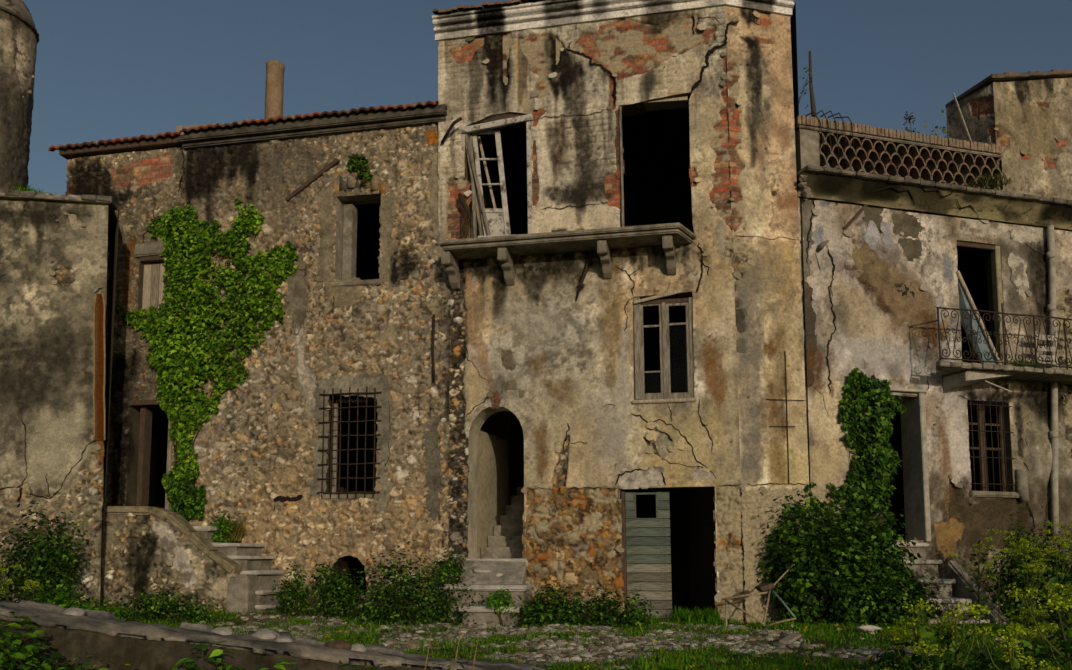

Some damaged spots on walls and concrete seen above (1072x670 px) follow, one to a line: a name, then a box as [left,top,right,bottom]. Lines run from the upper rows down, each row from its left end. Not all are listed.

water stain [0,10,32,188]
water stain [443,6,510,113]
water stain [545,0,580,18]
crack [538,41,617,119]
water stain [546,33,612,212]
flaking render [428,152,473,243]
flaking render [445,14,751,353]
crack [736,198,837,417]
peeling [841,206,949,348]
crack [0,413,97,507]
crack [531,399,808,490]
flaking render [935,475,1031,562]